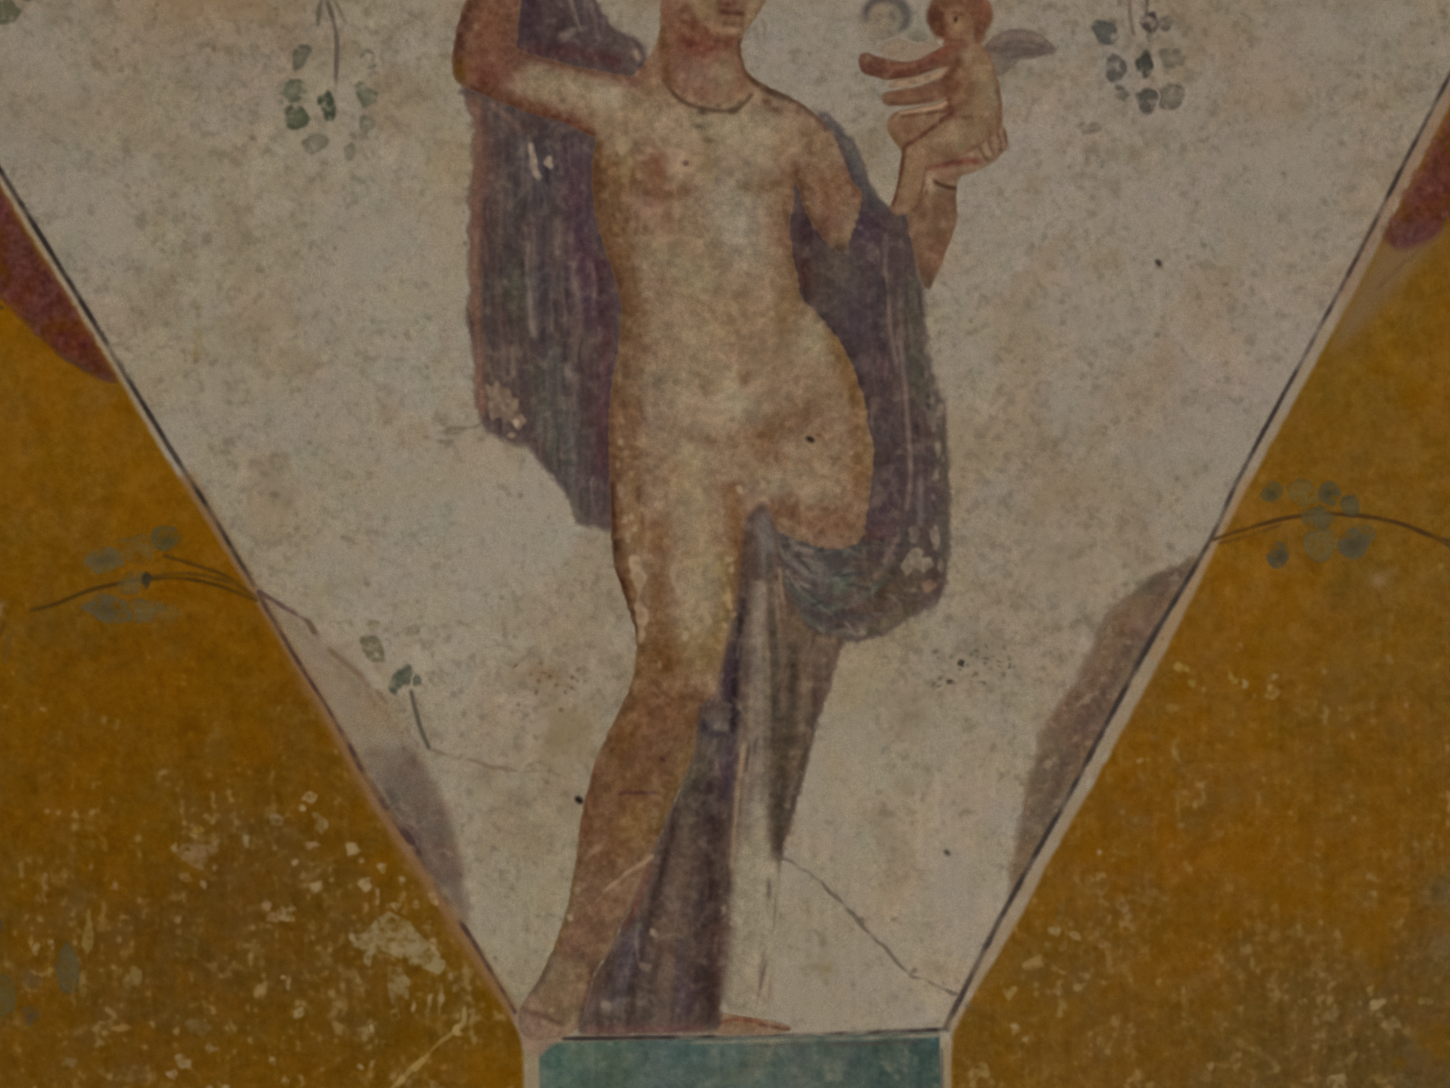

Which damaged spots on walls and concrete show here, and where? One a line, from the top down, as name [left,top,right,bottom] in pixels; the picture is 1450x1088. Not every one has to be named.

peeling [69,879,120,1011]
peeling [169,812,222,891]
peeling [260,898,298,930]
peeling [267,789,330,868]
peeling [308,876,336,895]
peeling [343,841,460,1022]
crack [773,852,978,1012]
peeling [1002,898,1112,1003]
peeling [279,974,306,1020]
peeling [1365,983,1435,1031]
peeling [164,1016,239,1082]
peeling [1299,1049,1358,1088]